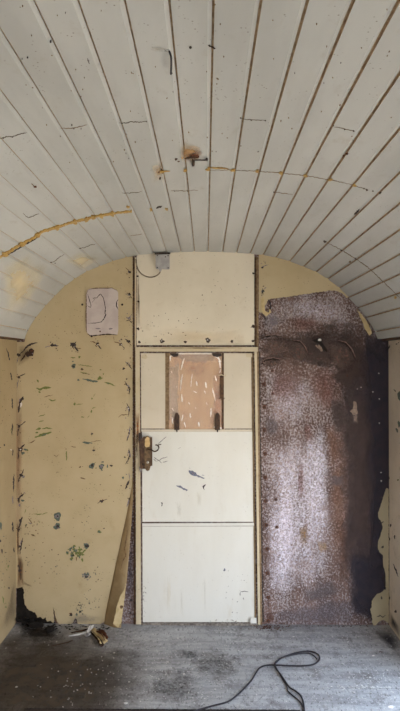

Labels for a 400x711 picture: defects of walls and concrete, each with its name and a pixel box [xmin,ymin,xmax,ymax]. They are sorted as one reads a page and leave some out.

corrosion [175,149,199,162]
spalling [6,342,37,362]
peeling [251,286,399,626]